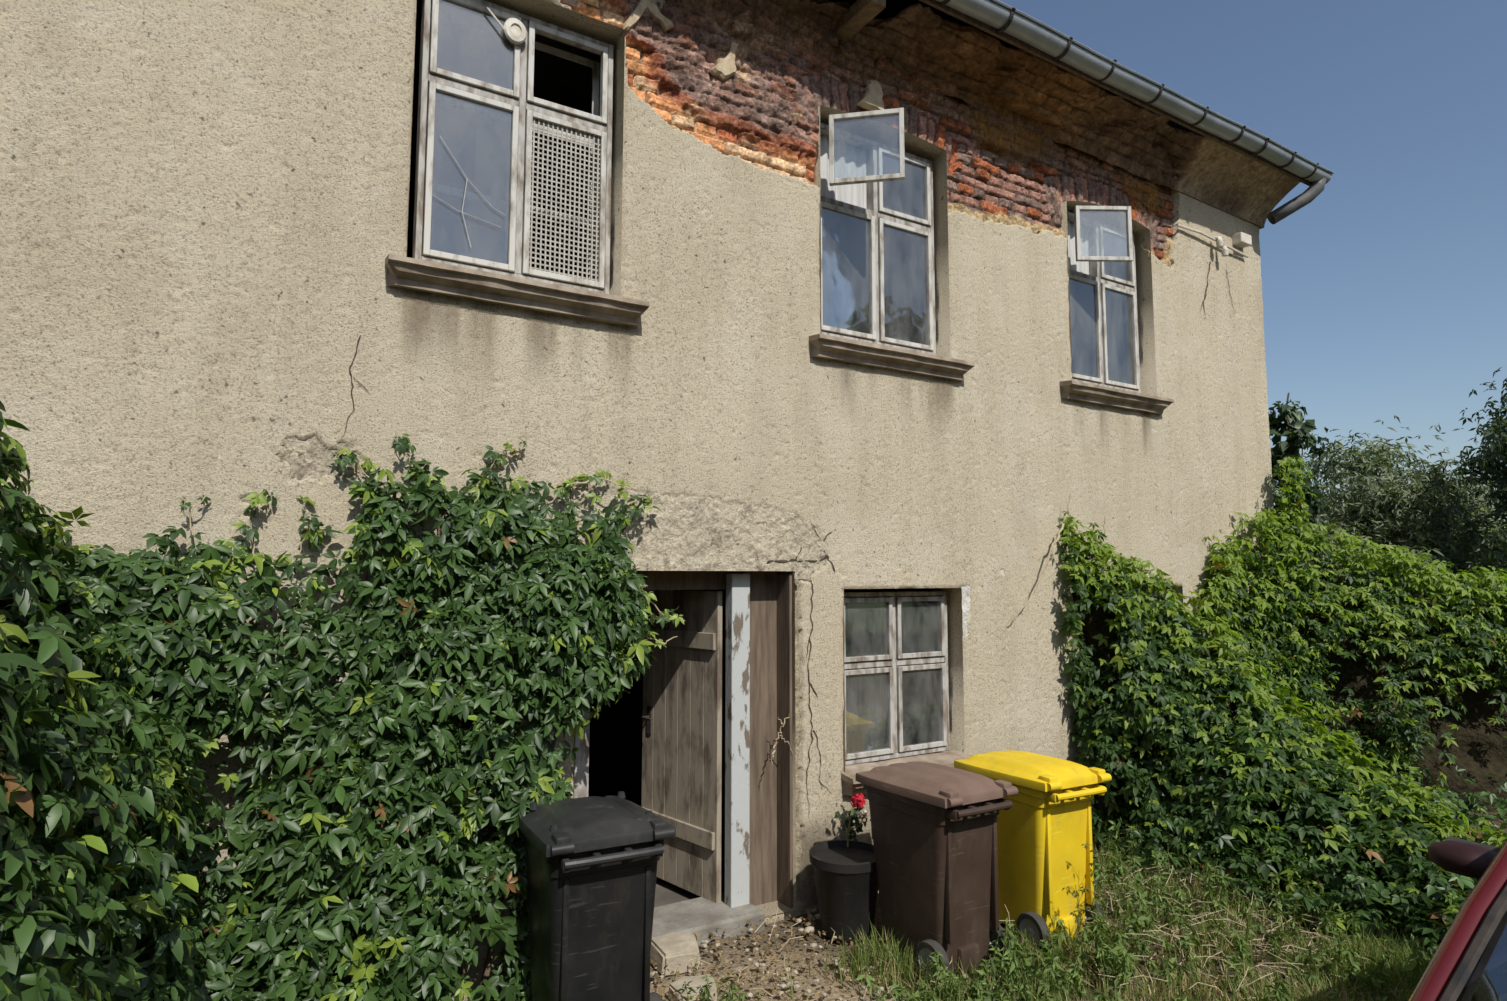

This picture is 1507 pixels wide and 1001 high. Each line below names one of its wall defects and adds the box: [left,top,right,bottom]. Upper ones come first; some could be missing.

spalling [560,0,1174,268]
crack [341,335,370,439]
spalling [561,487,828,901]